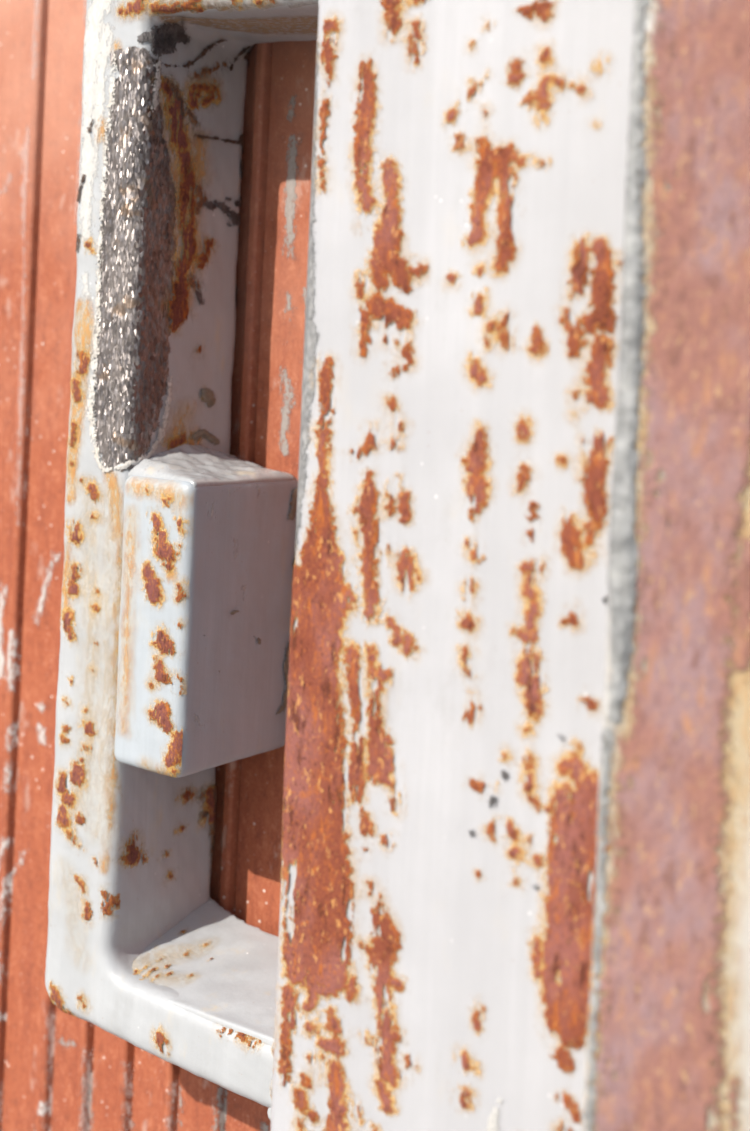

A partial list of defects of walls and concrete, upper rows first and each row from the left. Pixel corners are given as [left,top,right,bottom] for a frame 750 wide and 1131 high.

peeling [75,0,192,472]
rust [159,61,227,333]
peeling [202,197,242,234]
rust [117,0,340,194]
rust [348,58,429,379]
rust [379,0,425,66]
rust [443,74,552,389]
rust [62,301,188,705]
peeling [190,429,220,445]
peeling [200,388,216,408]
rust [484,0,750,1131]
rust [272,356,422,1131]